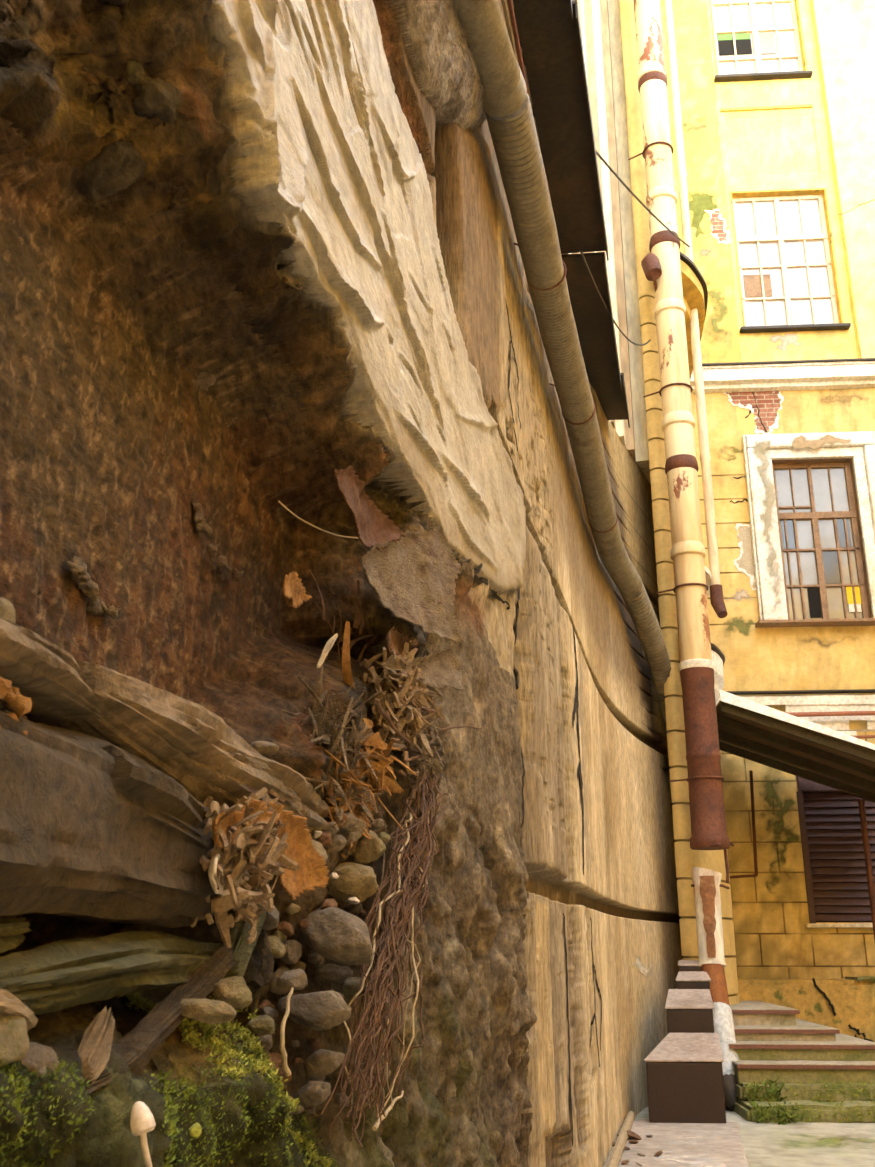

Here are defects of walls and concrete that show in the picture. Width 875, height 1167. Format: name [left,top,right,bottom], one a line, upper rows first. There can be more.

flaking render [705,209,731,244]
flaking render [722,391,784,434]
flaking render [734,523,756,600]
crack [572,622,584,875]
rust [680,667,730,850]
rust [700,876,716,958]
crack [558,899,602,1146]
crack [812,978,873,1042]